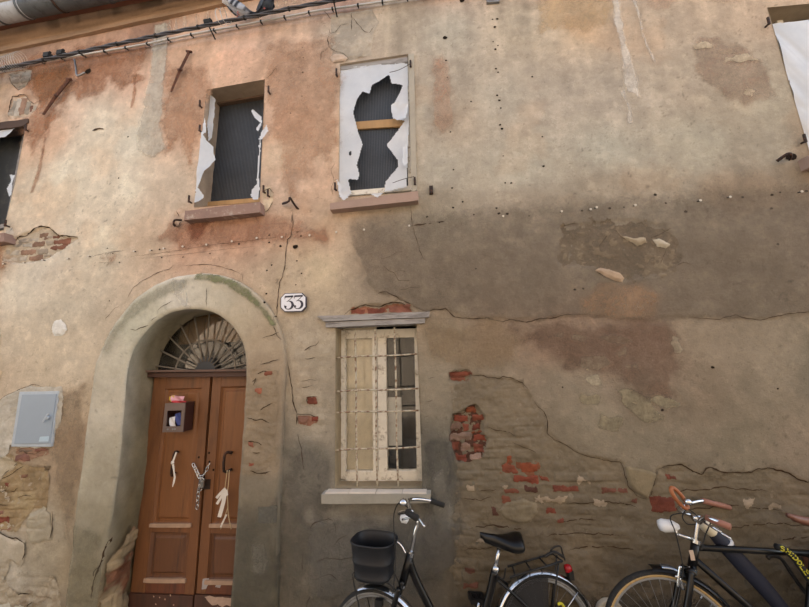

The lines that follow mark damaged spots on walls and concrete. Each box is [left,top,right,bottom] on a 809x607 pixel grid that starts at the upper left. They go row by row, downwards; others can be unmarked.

damp [613,0,638,95]
spalling [2,225,77,263]
crack [95,214,293,338]
spalling [344,302,412,315]
crack [379,212,584,323]
spalling [557,207,689,283]
crack [694,312,806,320]
crack [288,367,316,467]
spalling [0,448,53,560]
spalling [448,369,809,607]
spalling [0,575,61,607]
spalling [99,526,138,607]